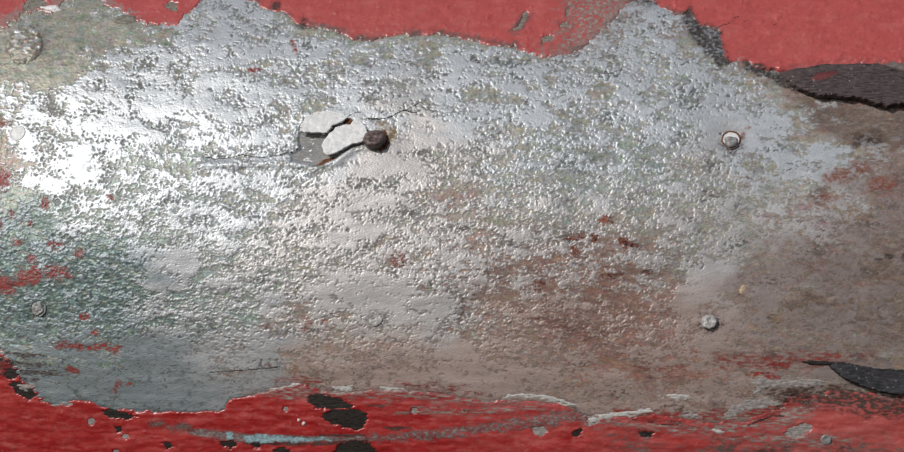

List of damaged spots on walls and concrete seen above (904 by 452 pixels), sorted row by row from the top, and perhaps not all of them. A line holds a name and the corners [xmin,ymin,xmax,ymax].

peeling [567,0,625,31]
peeling [327,388,387,398]
peeling [296,390,368,430]
peeling [396,406,469,415]
peeling [763,400,818,430]
peeling [188,429,255,449]
peeling [253,435,377,452]
peeling [603,418,698,435]
peeling [724,423,824,447]